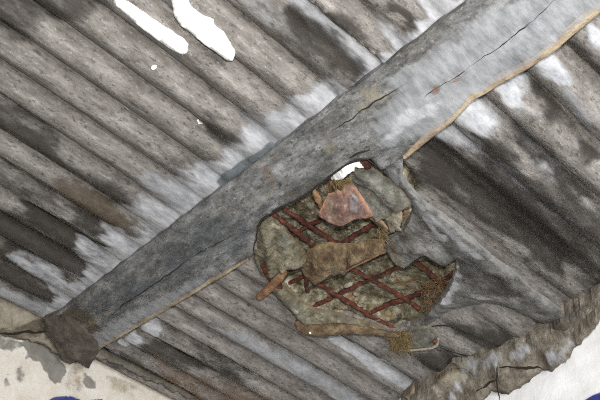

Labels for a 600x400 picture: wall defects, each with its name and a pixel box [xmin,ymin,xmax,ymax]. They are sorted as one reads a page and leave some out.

crack [424,0,554,98]
crack [332,85,404,131]
water stain [377,0,600,289]
water stain [0,0,464,390]
spalling [276,159,412,255]
spalling [283,252,455,326]
water stain [441,267,515,305]
water stain [210,326,361,400]
spalling [435,355,479,388]
water stain [450,323,513,369]
crack [476,364,546,400]
spalling [552,308,598,346]